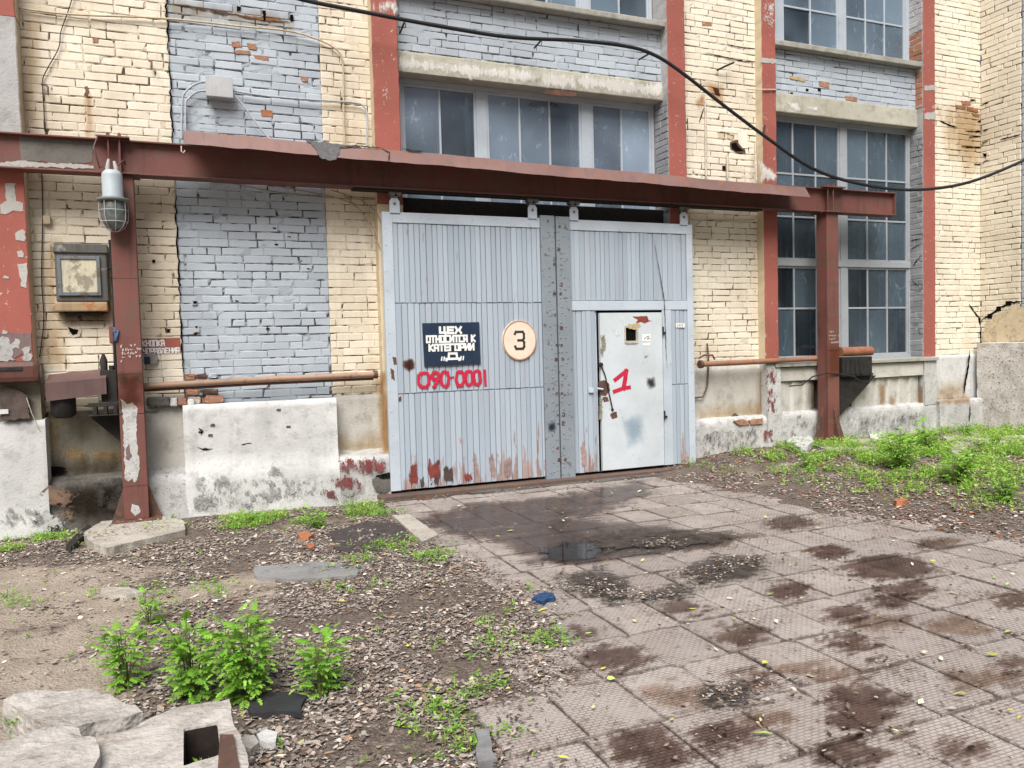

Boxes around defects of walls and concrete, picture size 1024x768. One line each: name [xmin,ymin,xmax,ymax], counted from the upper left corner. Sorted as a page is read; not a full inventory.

damp [398,56,663,97]
peeling [717,129,748,154]
peeling [0,183,23,214]
peeling [3,229,28,288]
peeling [981,305,1024,343]
peeling [0,329,33,361]
crack [964,301,1023,422]
peeling [121,400,140,483]